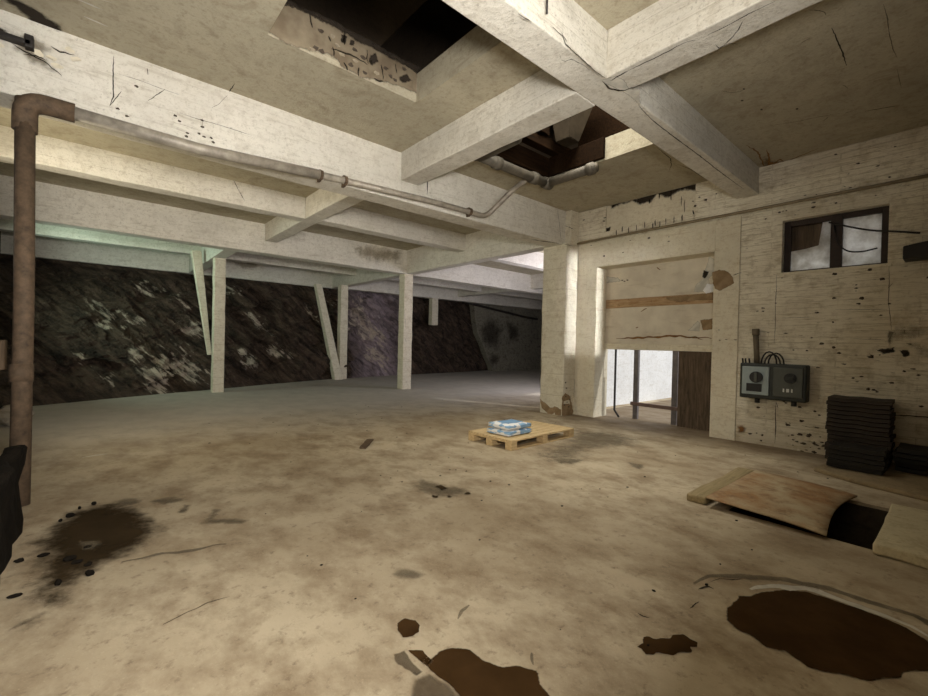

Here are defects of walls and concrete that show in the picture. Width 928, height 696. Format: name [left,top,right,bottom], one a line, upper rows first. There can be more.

peeling [0,40,81,76]
peeling [269,0,422,93]
crack [554,28,693,78]
crack [712,1,775,54]
crack [815,10,847,88]
spalling [611,184,707,214]
peeling [694,257,739,293]
water stain [34,499,220,603]
water stain [694,574,928,637]